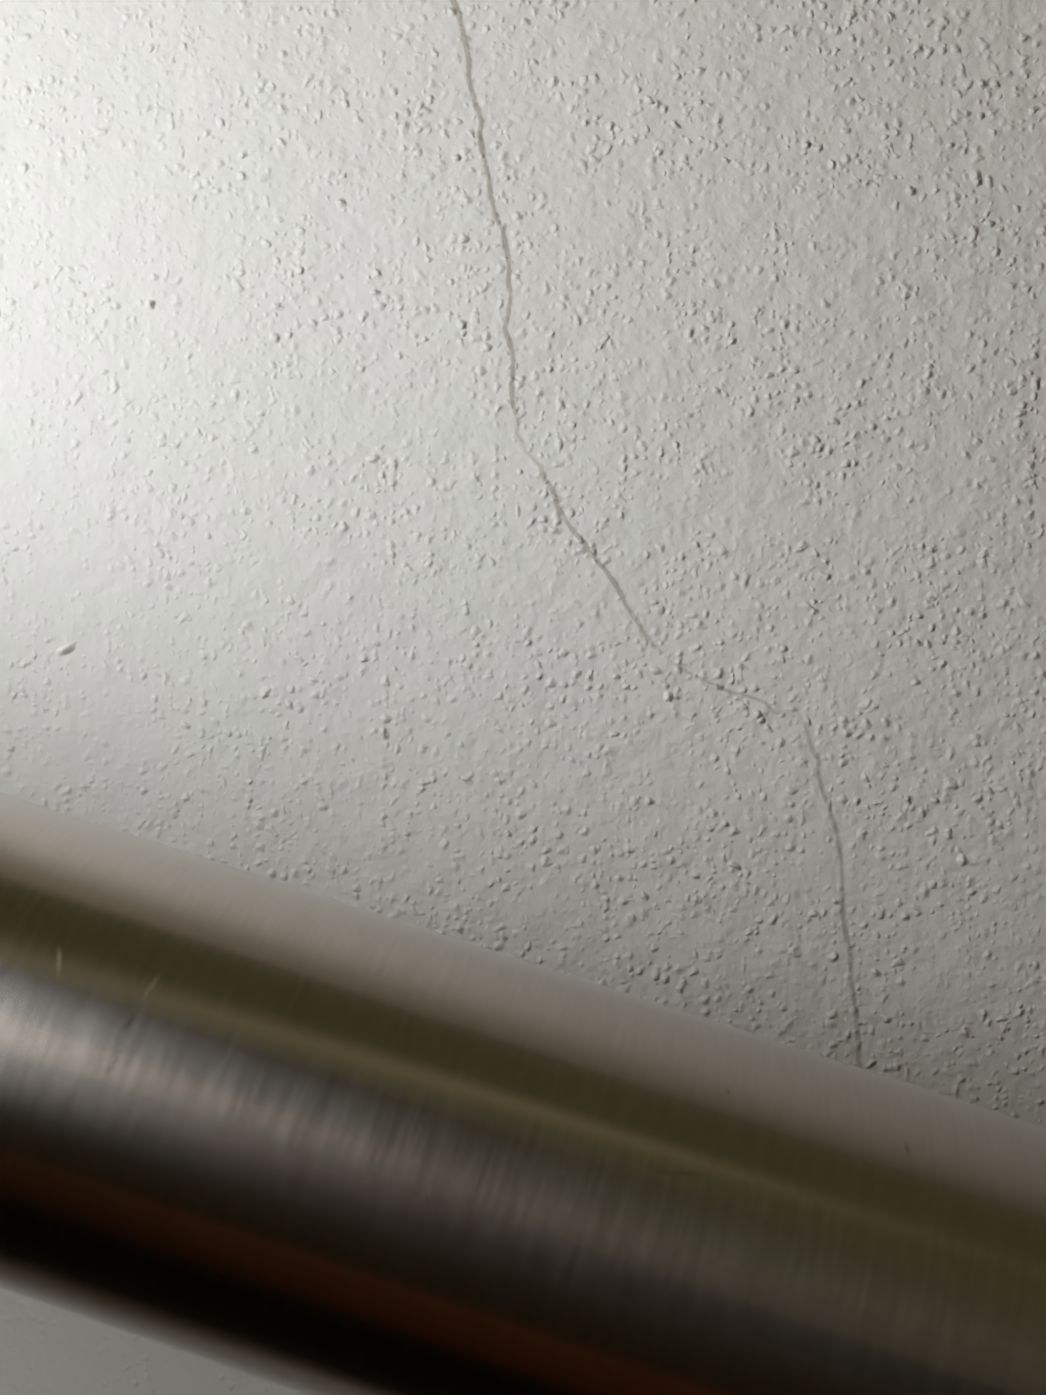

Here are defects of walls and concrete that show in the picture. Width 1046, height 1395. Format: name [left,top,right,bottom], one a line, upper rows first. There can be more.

crack [452,0,516,414]
crack [551,489,625,604]